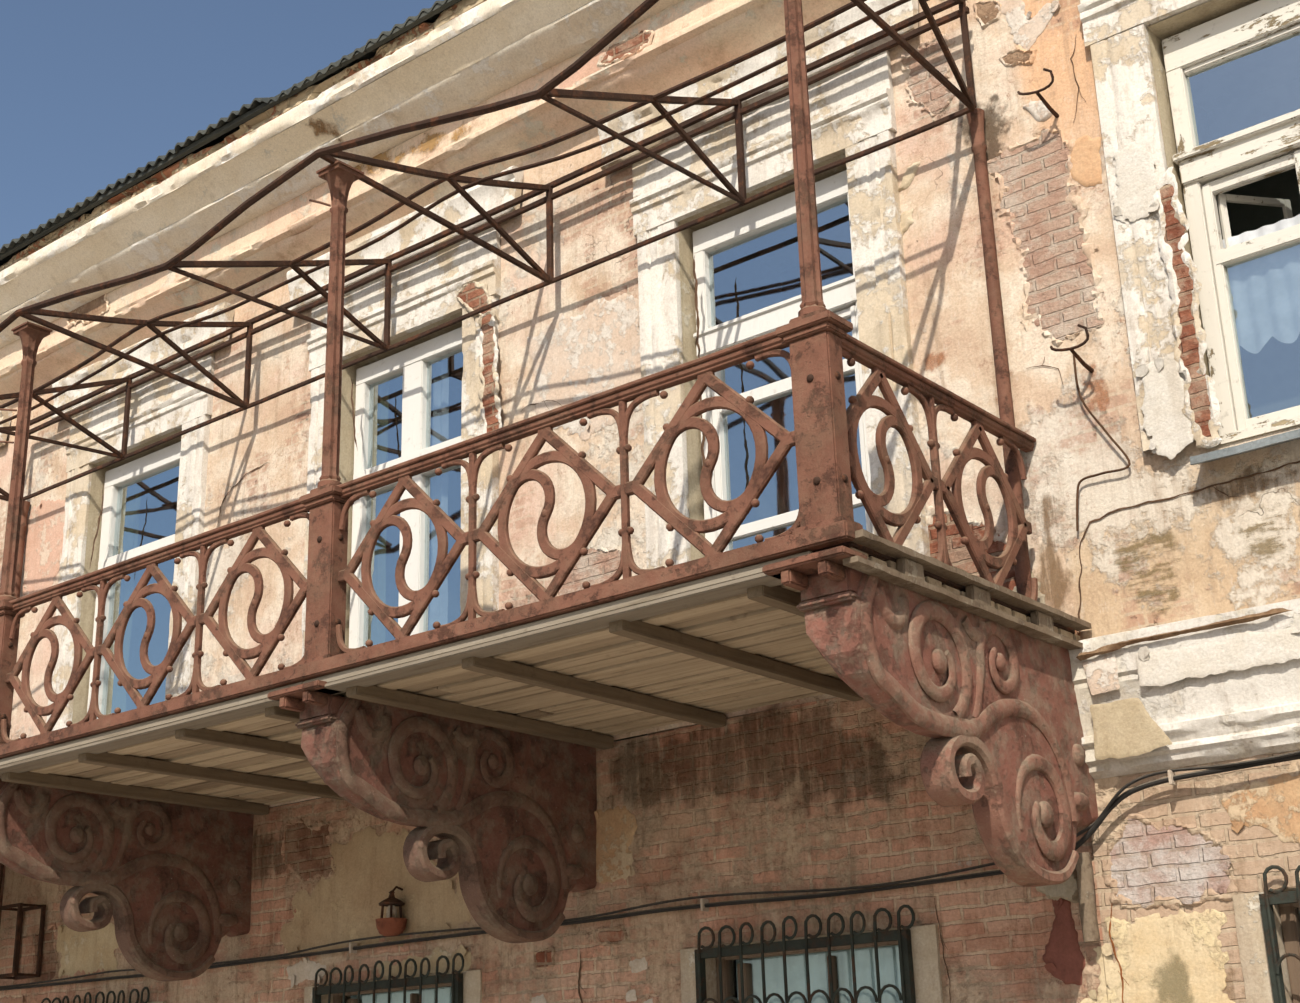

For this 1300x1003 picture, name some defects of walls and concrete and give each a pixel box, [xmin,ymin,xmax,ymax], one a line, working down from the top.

spalling [555,28,654,89]
peeling [973,0,1061,67]
peeling [987,100,1222,459]
spalling [456,281,502,434]
leakage [1115,533,1179,611]
peeling [1076,608,1300,760]
peeling [1102,813,1245,911]